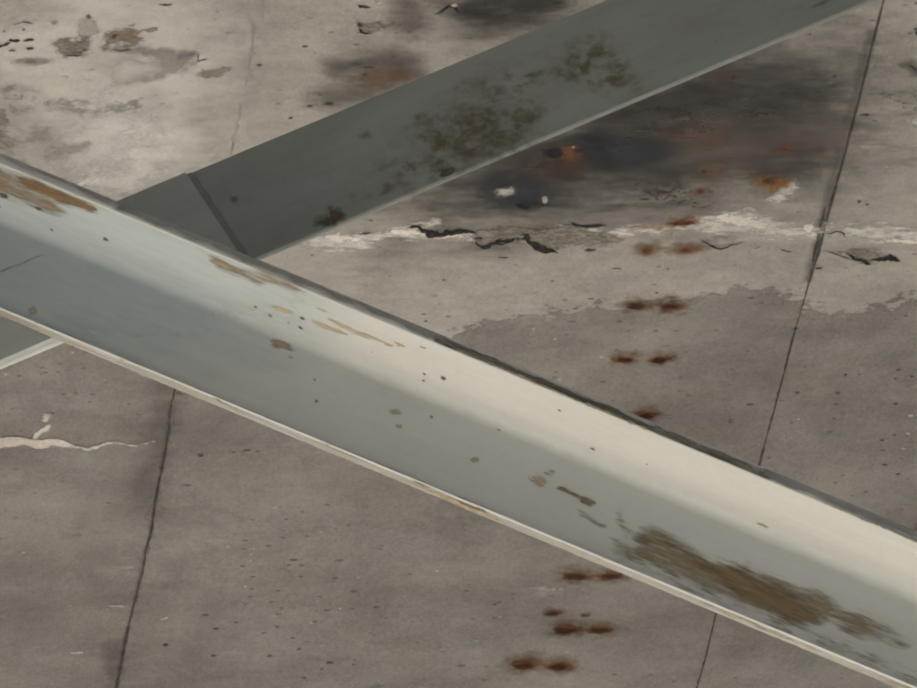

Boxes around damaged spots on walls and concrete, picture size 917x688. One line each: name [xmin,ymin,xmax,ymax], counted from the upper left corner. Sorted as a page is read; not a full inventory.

damp [0,0,606,201]
damp [260,0,917,339]
rust [757,177,789,190]
crack [826,230,901,265]
rust [622,297,686,312]
rust [611,353,637,365]
rust [648,355,676,364]
rust [634,407,658,421]
rust [564,569,628,580]
rust [545,610,613,636]
rust [513,657,575,672]